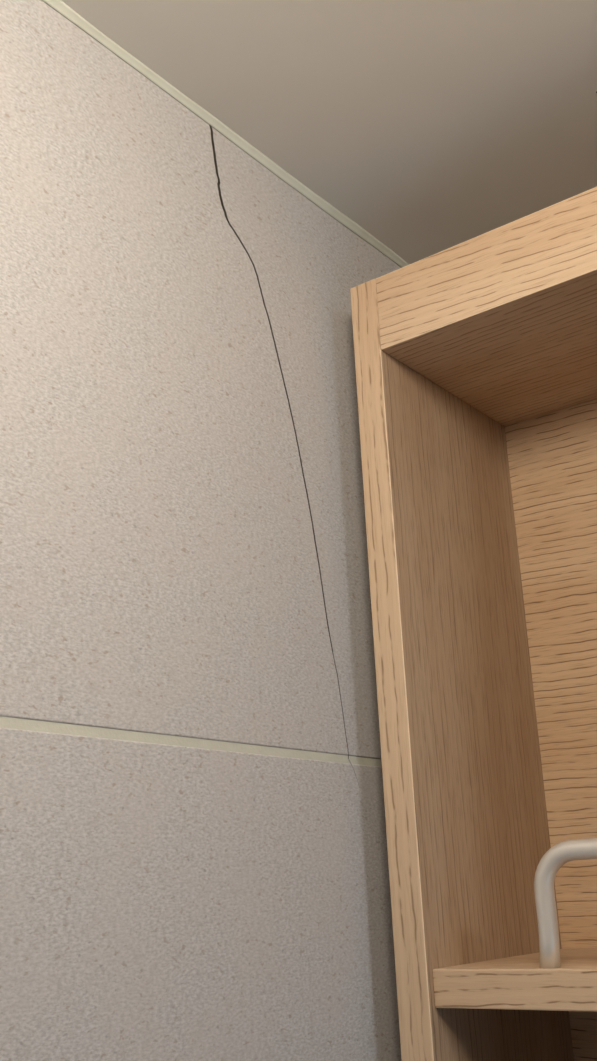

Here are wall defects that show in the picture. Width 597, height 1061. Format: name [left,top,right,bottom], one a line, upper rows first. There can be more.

crack [209,125,360,787]